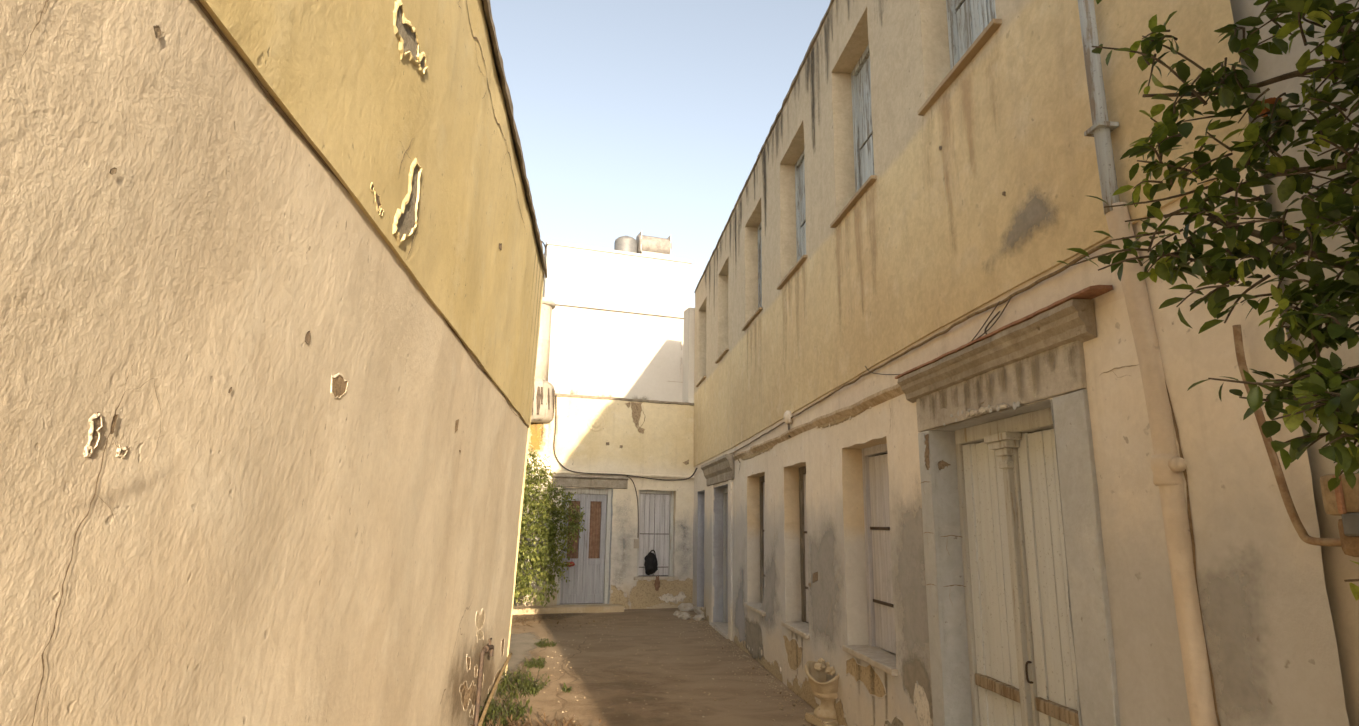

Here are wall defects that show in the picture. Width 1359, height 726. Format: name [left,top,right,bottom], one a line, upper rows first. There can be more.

crack [19,0,49,67]
spalling [393,0,428,78]
crack [194,0,351,195]
crack [458,0,525,227]
spalling [370,158,422,247]
spalling [330,373,349,399]
crack [444,318,527,426]
spalling [83,412,128,459]
crack [32,357,161,726]
damp [453,647,491,719]